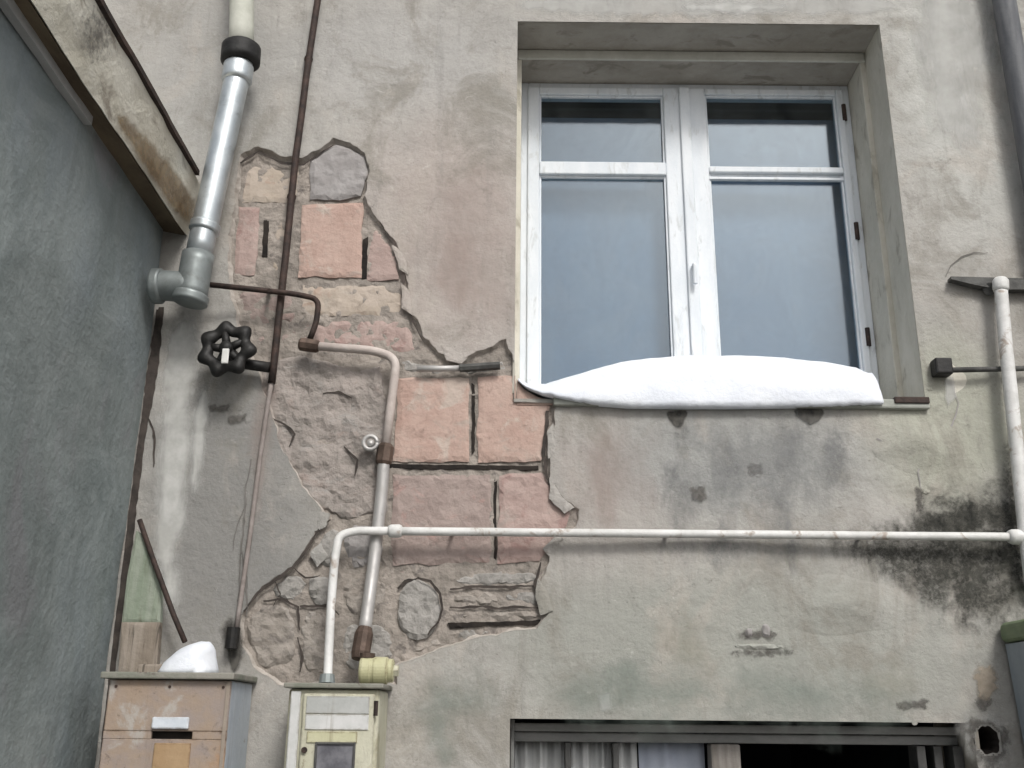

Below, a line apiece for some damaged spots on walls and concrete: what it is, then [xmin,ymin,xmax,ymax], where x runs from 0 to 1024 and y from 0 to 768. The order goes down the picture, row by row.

damp [157,322,207,603]
spalling [227,137,579,686]
damp [872,452,1024,625]
spalling [965,661,1011,767]